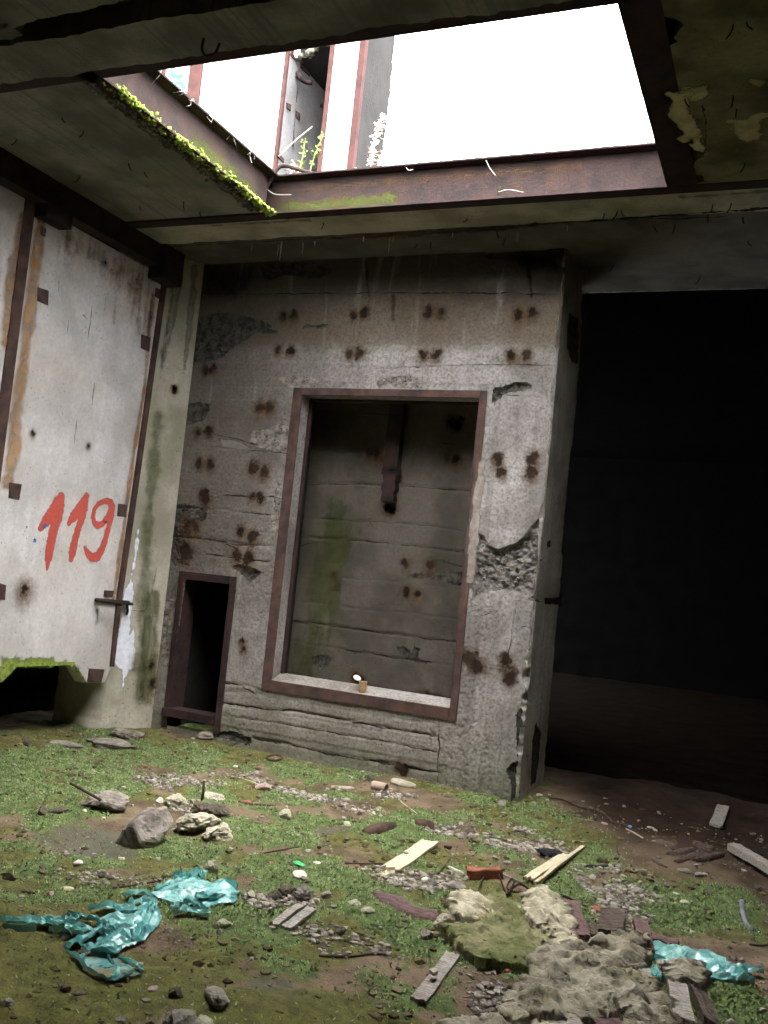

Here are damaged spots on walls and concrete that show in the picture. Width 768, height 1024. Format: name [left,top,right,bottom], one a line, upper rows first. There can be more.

peeling [666,86,708,152]
peeling [726,113,768,141]
rust [3,213,44,488]
spalling [193,313,278,366]
spalling [492,382,532,403]
rust [491,452,506,478]
rust [524,451,539,480]
rust [233,526,259,565]
spalling [405,519,563,608]
rust [462,651,484,674]
rust [500,653,519,686]
spalling [506,697,541,801]